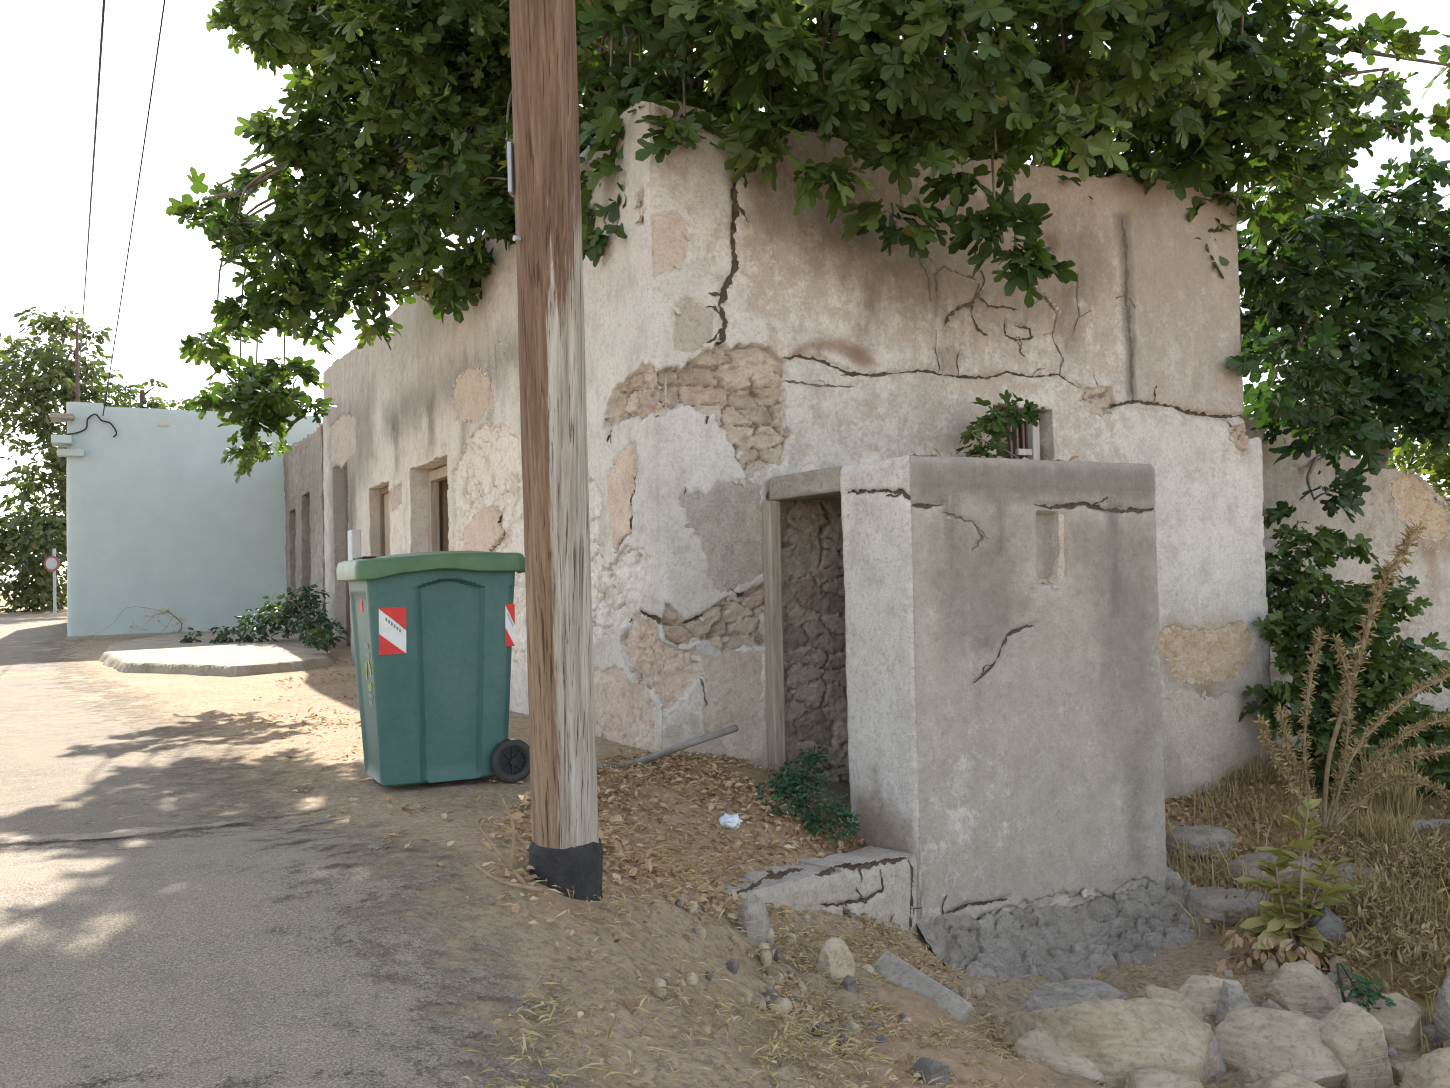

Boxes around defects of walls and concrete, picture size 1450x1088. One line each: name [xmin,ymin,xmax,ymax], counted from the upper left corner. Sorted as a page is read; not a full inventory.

crack [781,218,1241,428]
spalling [452,367,527,672]
spalling [588,300,849,784]
crack [973,624,1035,683]